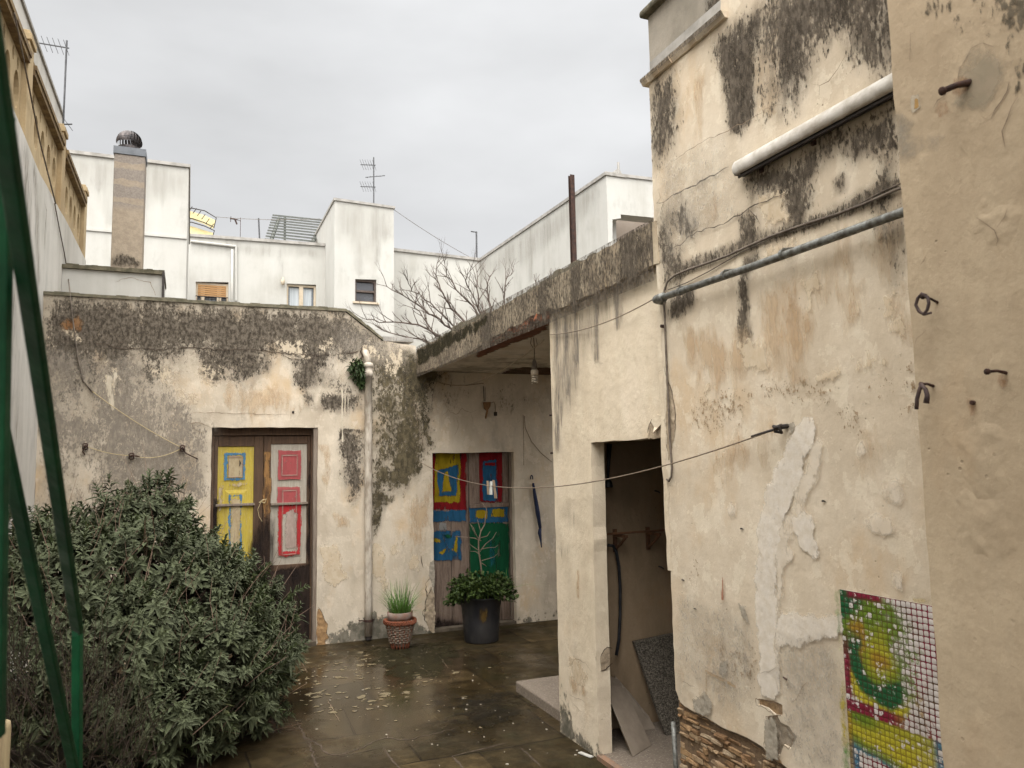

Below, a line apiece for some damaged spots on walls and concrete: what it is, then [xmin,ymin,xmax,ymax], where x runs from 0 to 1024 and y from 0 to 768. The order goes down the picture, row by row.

crack [656,167,727,214]
crack [662,191,788,249]
leakage [43,0,909,539]
spalling [316,607,329,645]
spalling [677,640,797,768]